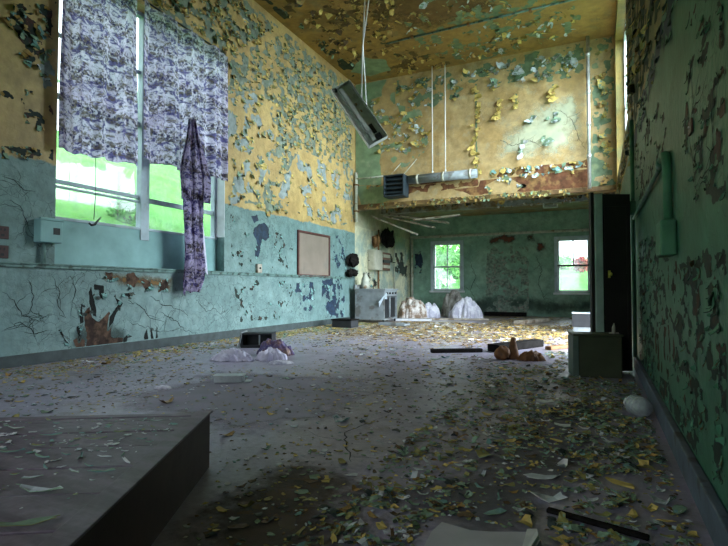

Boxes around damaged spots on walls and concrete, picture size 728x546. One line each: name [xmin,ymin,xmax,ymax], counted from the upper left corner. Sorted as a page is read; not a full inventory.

peeling [2,1,56,89]
peeling [0,89,53,132]
peeling [1,146,54,161]
peeling [149,0,678,269]
peeling [682,0,726,204]
crack [1,276,83,341]
spalling [59,272,170,347]
crack [127,296,232,333]
peeling [235,236,347,322]
peeling [638,236,727,485]